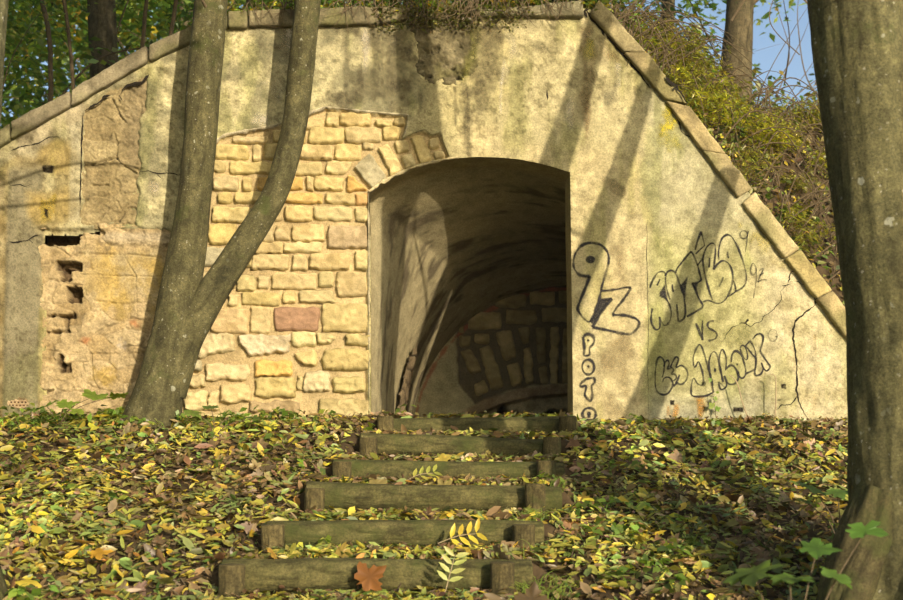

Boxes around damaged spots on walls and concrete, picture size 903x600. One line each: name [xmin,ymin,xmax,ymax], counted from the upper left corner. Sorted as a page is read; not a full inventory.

water stain [331,90,358,106]
water stain [335,26,413,105]
spalling [38,78,171,422]
flaking render [184,106,460,424]
spalling [7,399,29,408]
crack [725,271,817,418]